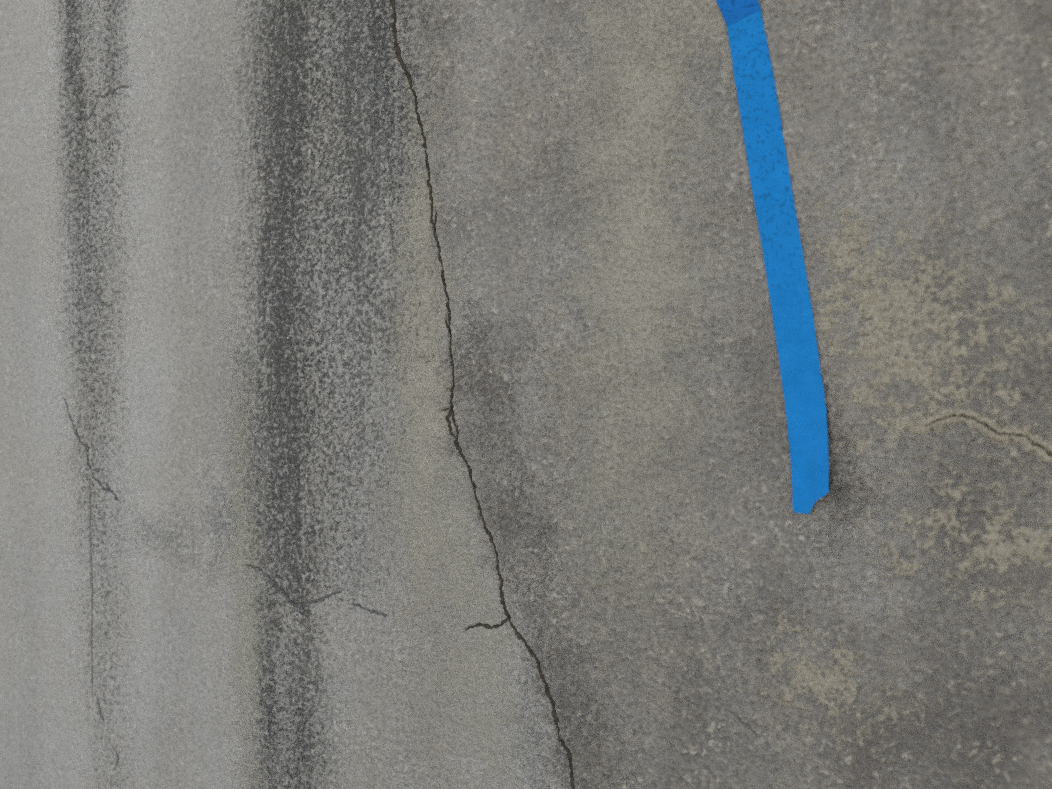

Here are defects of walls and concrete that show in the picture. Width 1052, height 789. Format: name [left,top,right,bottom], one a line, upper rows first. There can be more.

water stain [64,0,110,254]
crack [65,401,119,765]
crack [245,565,387,616]
water stain [226,0,514,789]
crack [390,0,575,789]
crack [916,408,1052,462]